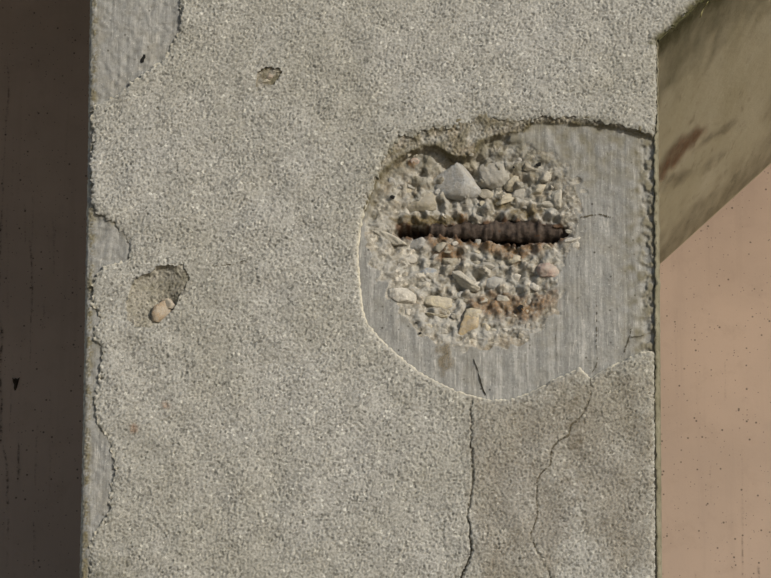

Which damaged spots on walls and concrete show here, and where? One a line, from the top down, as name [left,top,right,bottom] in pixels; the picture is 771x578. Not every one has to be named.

peeling [88,0,182,114]
spalling [256,67,282,88]
peeling [85,208,132,289]
spalling [126,264,190,328]
spalling [359,112,655,400]
peeling [79,300,116,578]
crack [460,422,473,578]
crack [530,305,598,551]